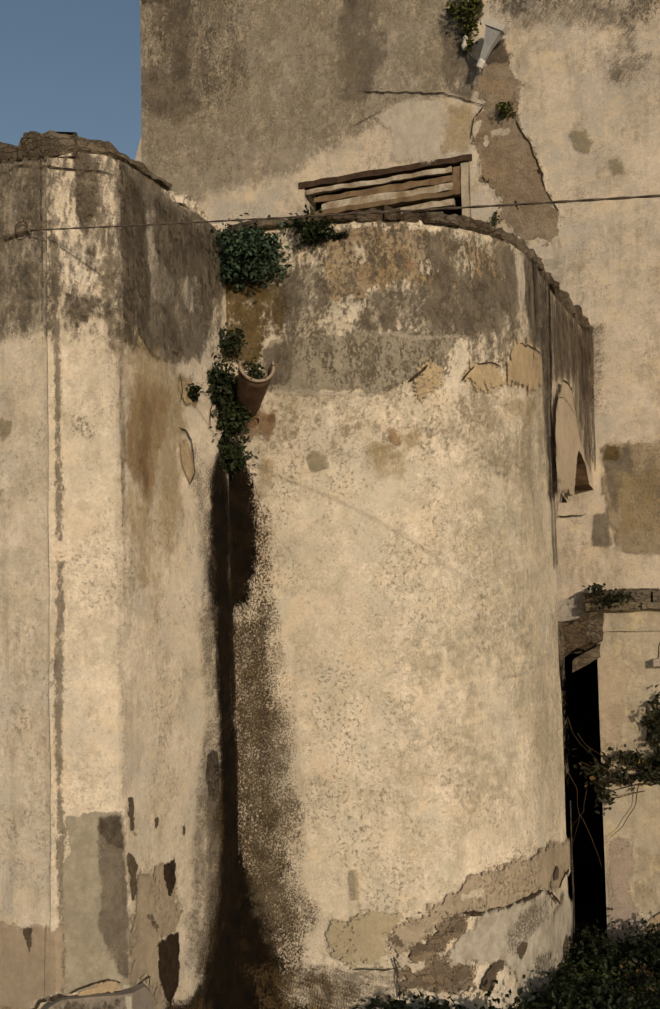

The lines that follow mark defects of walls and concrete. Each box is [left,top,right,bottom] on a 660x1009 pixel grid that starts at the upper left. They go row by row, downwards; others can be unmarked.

spalling [468,52,563,246]
damp [0,0,660,568]
spalling [174,370,197,410]
spalling [175,434,196,489]
spalling [410,356,444,403]
spalling [462,333,543,393]
flaking render [555,378,579,498]
damp [0,561,132,1009]
spalling [122,792,135,836]
spalling [20,920,41,952]
spalling [64,849,184,1009]
peeling [324,834,571,1002]